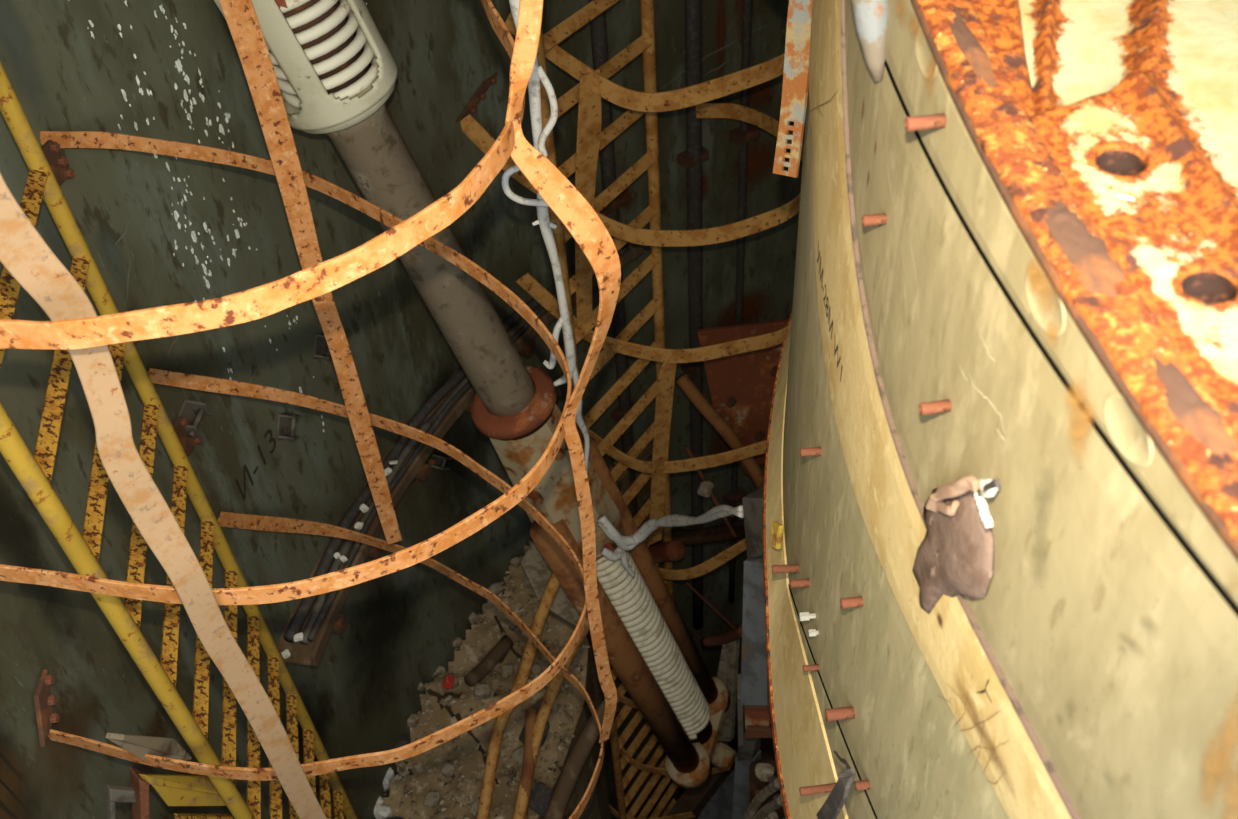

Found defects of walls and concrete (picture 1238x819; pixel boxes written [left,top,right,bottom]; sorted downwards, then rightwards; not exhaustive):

corrosion [948,6,997,87]
leakage [42,214,66,257]
corrosion [1044,201,1124,299]
corrosion [1152,354,1238,459]